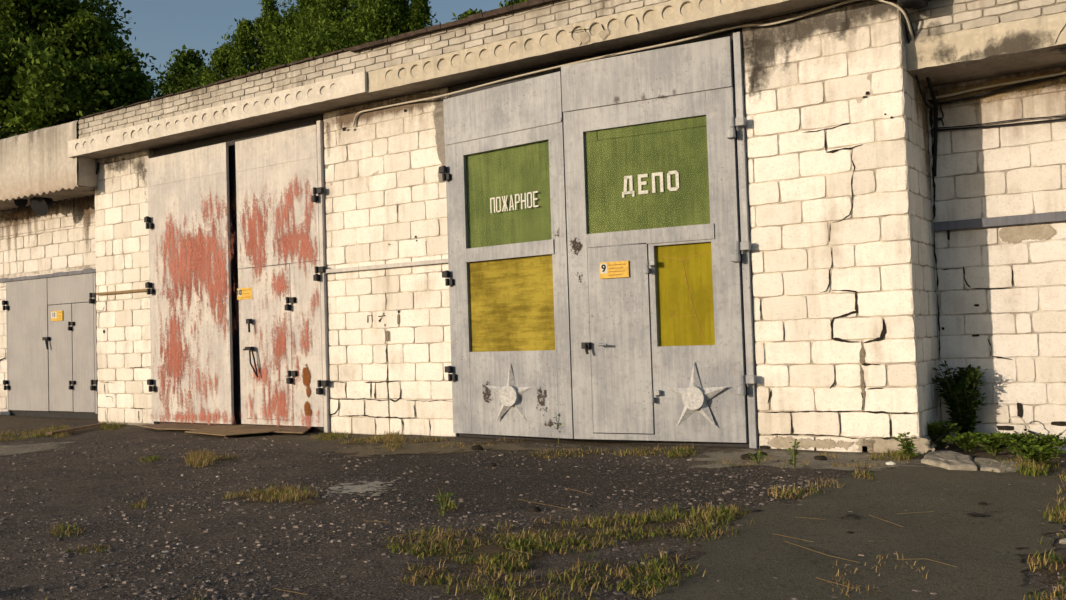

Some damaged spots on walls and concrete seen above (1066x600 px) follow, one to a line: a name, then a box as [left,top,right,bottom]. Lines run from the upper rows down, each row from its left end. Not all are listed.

water stain [743,0,900,87]
water stain [965,33,1038,61]
water stain [932,67,1066,123]